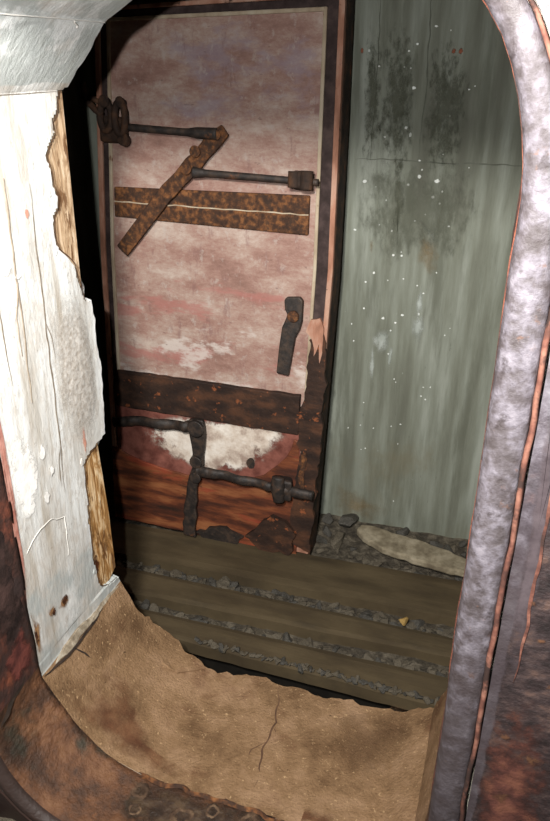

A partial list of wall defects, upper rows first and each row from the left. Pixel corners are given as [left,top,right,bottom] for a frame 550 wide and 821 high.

water stain [366,39,412,147]
spalling [45,90,85,299]
corrosion [0,423,25,574]
spalling [55,443,119,664]
corrosion [91,699,161,765]
crack [249,688,280,787]
corrosion [472,517,550,821]